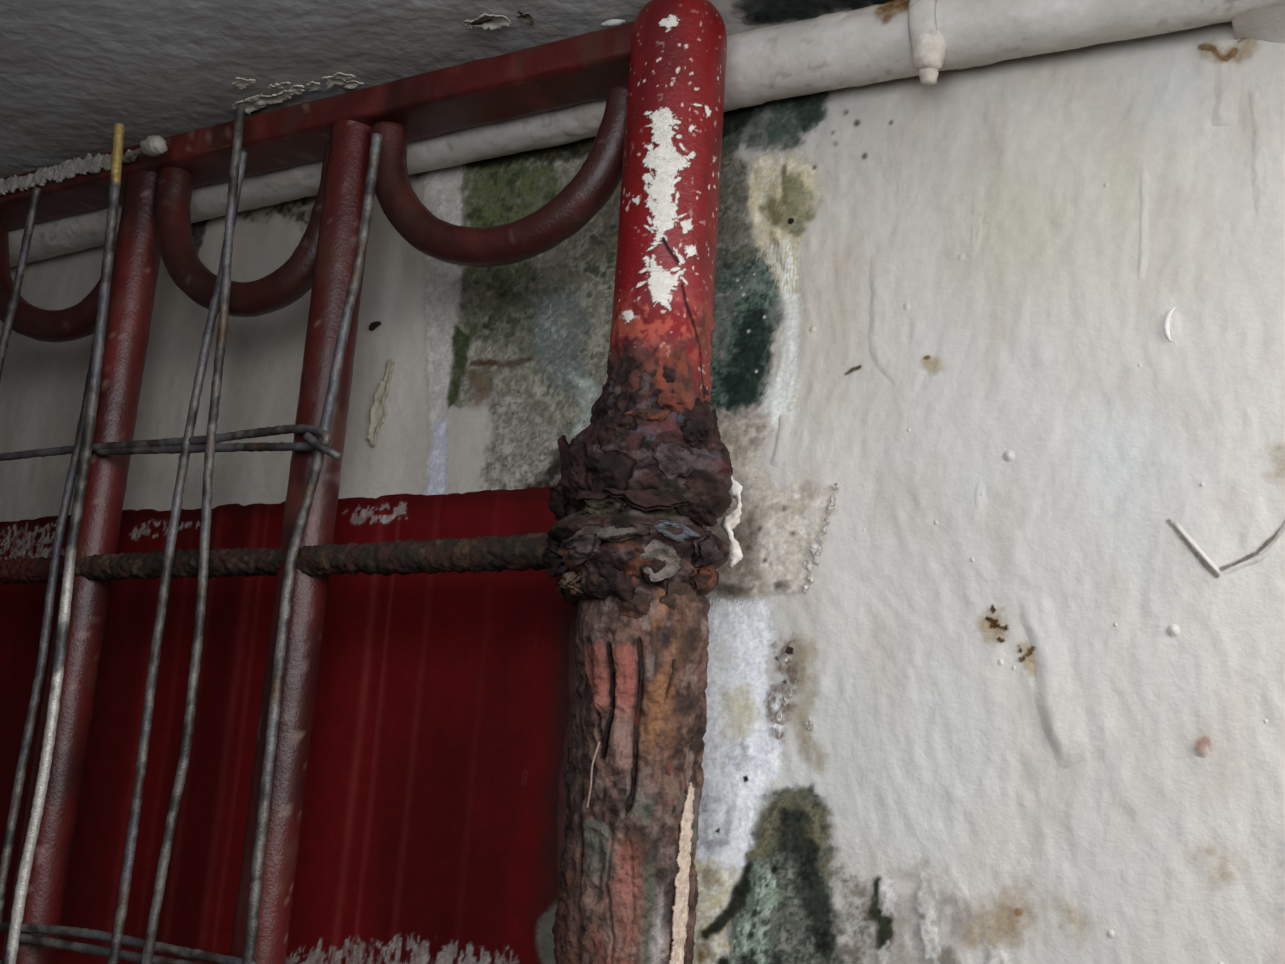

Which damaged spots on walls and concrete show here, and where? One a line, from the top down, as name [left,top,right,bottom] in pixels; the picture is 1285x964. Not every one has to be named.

peeling [659,15,679,32]
mould [735,0,893,25]
damp [427,179,622,495]
damp [461,136,596,228]
peeling [632,103,711,311]
damp [710,91,828,432]
corrosion [541,390,757,618]
corrosion [981,605,1038,676]
damp [692,594,893,964]